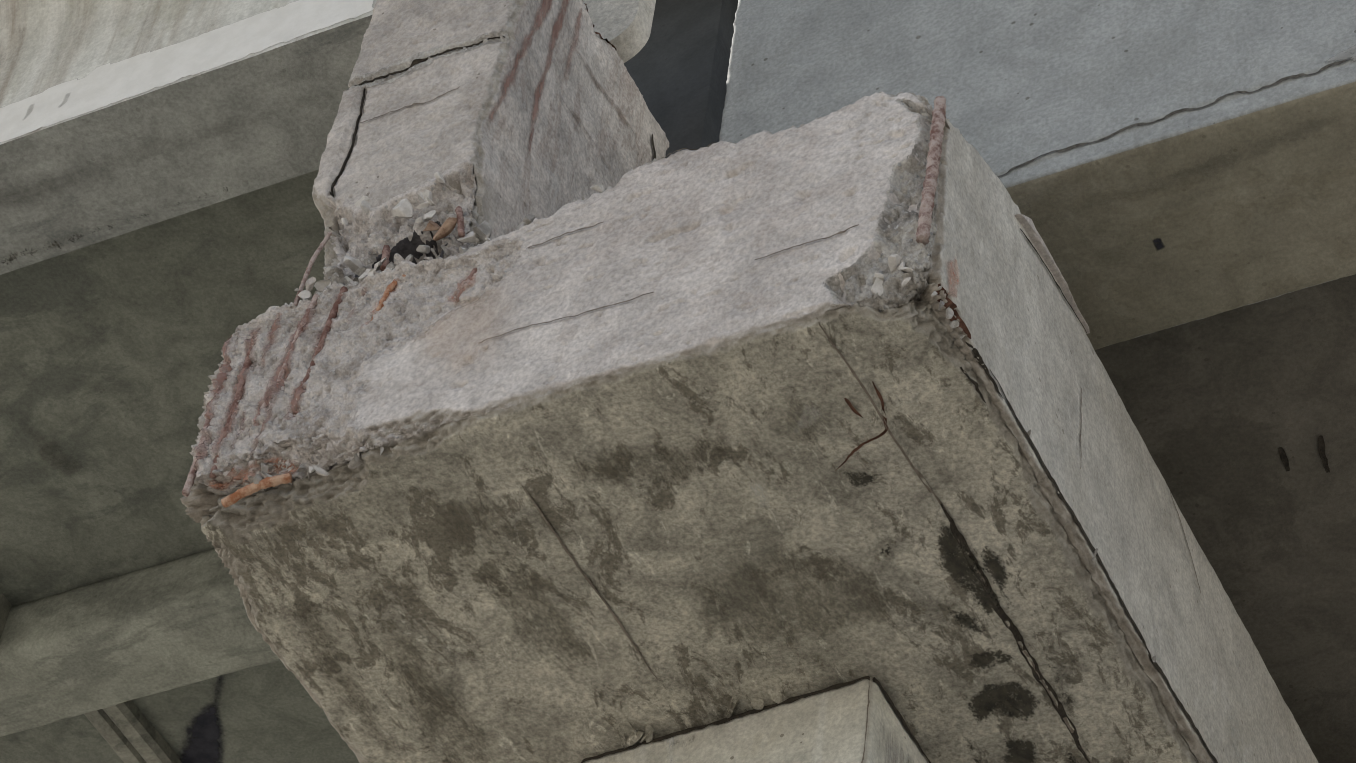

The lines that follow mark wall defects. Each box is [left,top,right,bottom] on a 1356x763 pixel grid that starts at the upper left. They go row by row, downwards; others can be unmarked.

crack [329,28,509,197]
crack [997,56,1356,177]
spalling [823,96,946,312]
spalling [182,159,536,508]
crack [522,486,658,680]
damp [844,473,877,487]
crack [817,318,1092,763]
damp [935,526,1008,634]
crack [931,283,1218,763]
damp [179,676,223,763]
damp [968,649,1039,723]
damp [1003,738,1036,763]